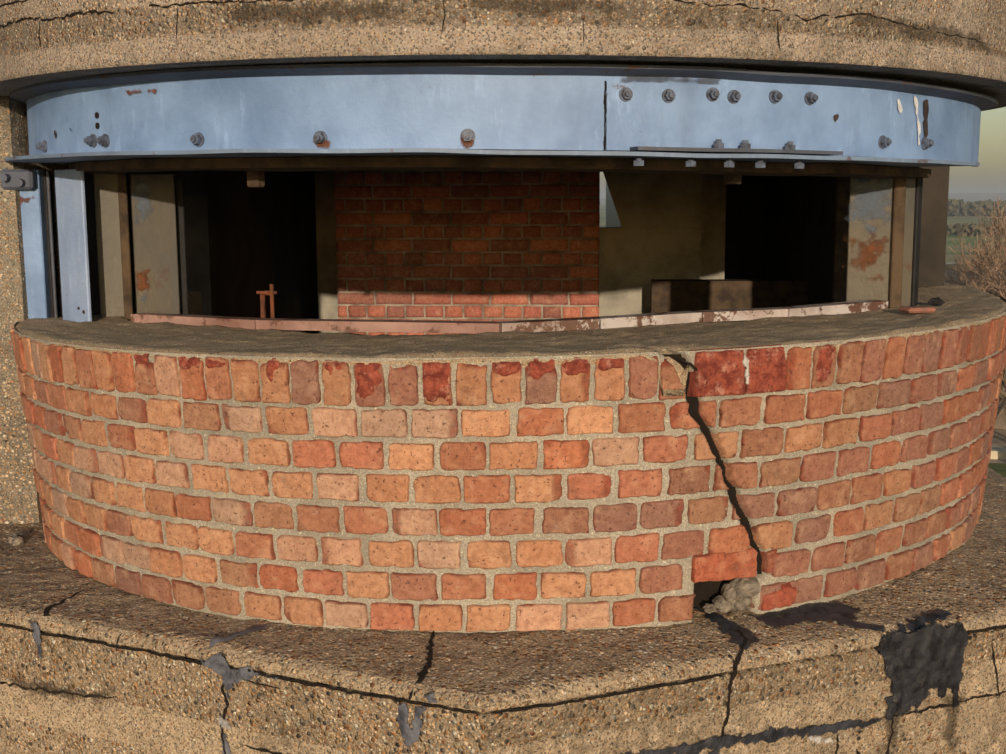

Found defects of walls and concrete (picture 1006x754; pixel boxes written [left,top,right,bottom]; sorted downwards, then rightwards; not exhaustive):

crack [0,0,114,48]
crack [149,0,294,39]
crack [674,0,993,52]
rust [849,236,888,270]
crack [659,354,762,574]
crack [0,589,748,754]
damp [620,718,882,754]